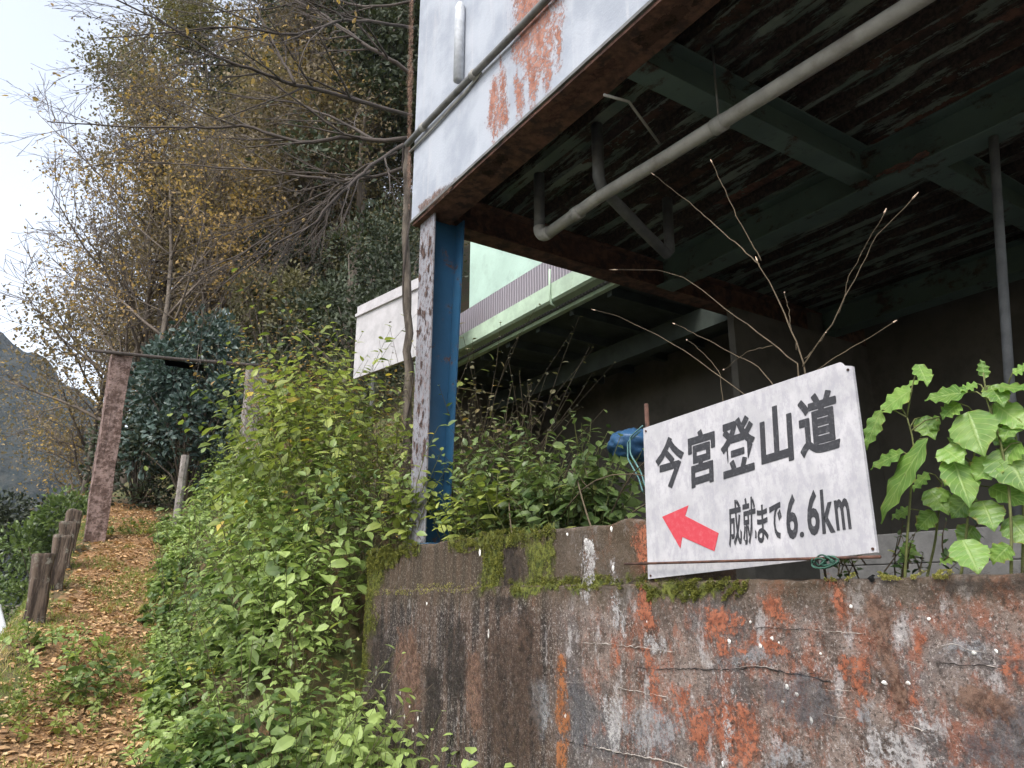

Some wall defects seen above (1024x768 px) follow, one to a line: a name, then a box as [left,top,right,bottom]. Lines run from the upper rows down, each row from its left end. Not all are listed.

corrosion [487,0,565,144]
leakage [365,612,396,751]
leakage [422,618,469,741]
leakage [480,537,552,768]
corrosion [630,524,655,632]
corrosion [641,646,761,768]
crack [557,642,851,720]
corrosion [701,606,792,658]
corrosion [828,573,848,620]
corrosion [837,654,871,726]
corrosion [954,644,1024,724]